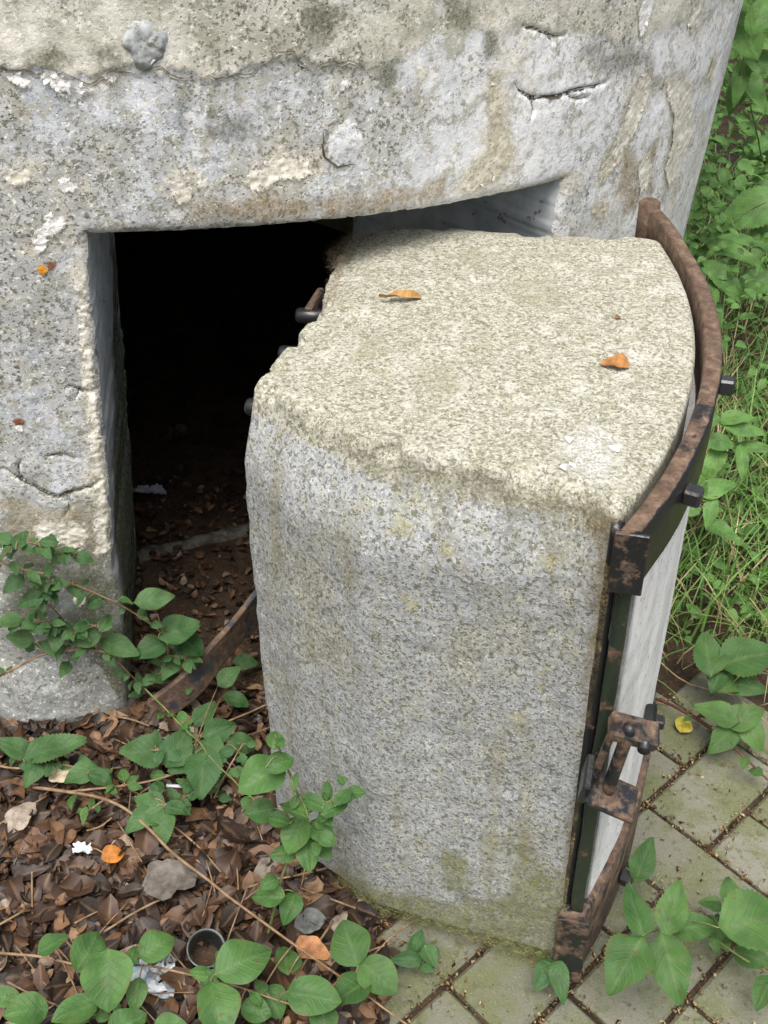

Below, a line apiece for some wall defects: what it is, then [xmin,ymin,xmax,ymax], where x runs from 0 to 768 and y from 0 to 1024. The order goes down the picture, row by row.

crack [522,24,561,42]
crack [515,82,603,114]
crack [7,460,94,512]